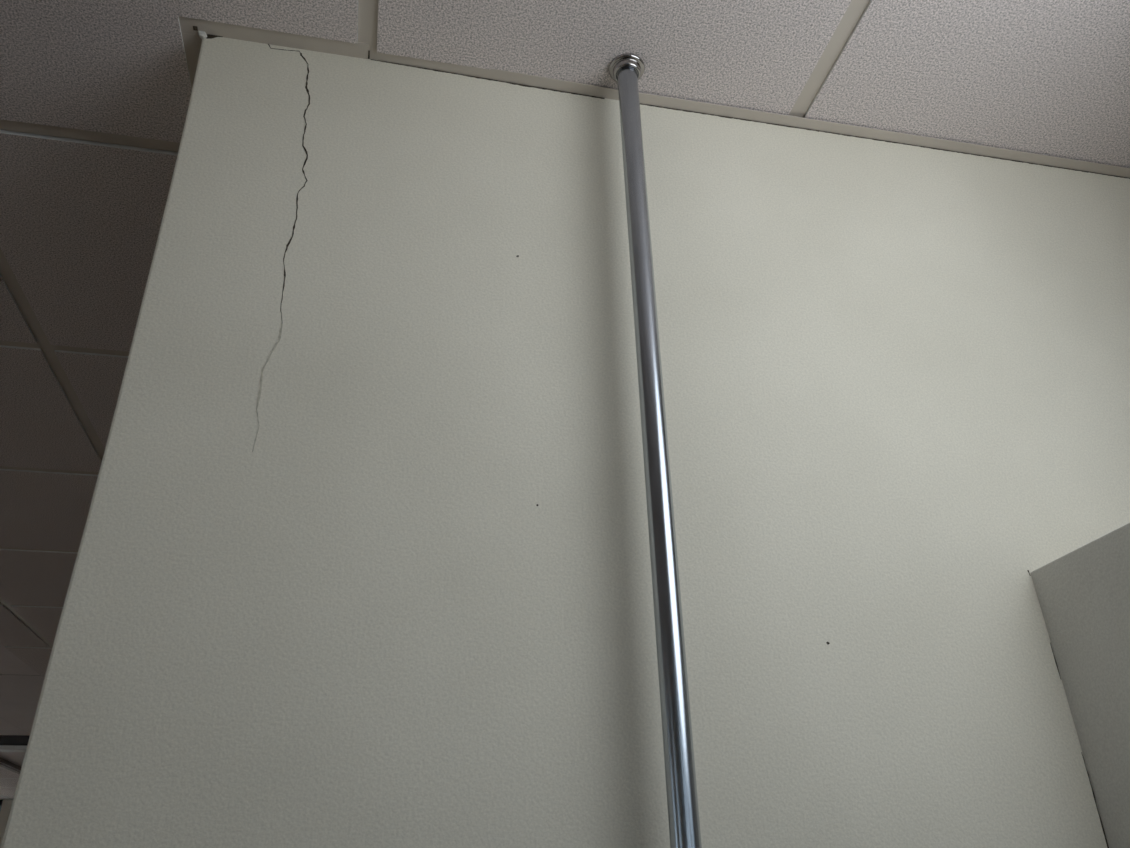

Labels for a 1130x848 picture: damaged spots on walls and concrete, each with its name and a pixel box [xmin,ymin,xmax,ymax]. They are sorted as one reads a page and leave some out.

crack [252,44,310,452]